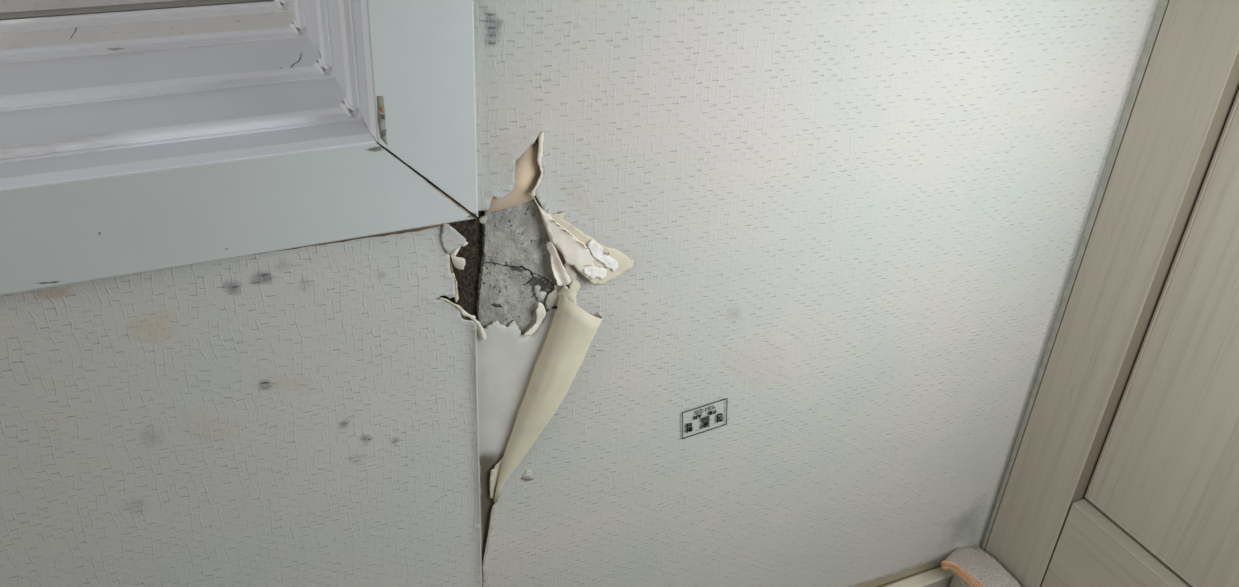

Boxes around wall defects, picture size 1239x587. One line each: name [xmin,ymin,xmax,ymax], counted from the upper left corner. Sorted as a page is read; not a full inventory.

spalling [476,199,568,335]
flaking render [583,240,618,280]